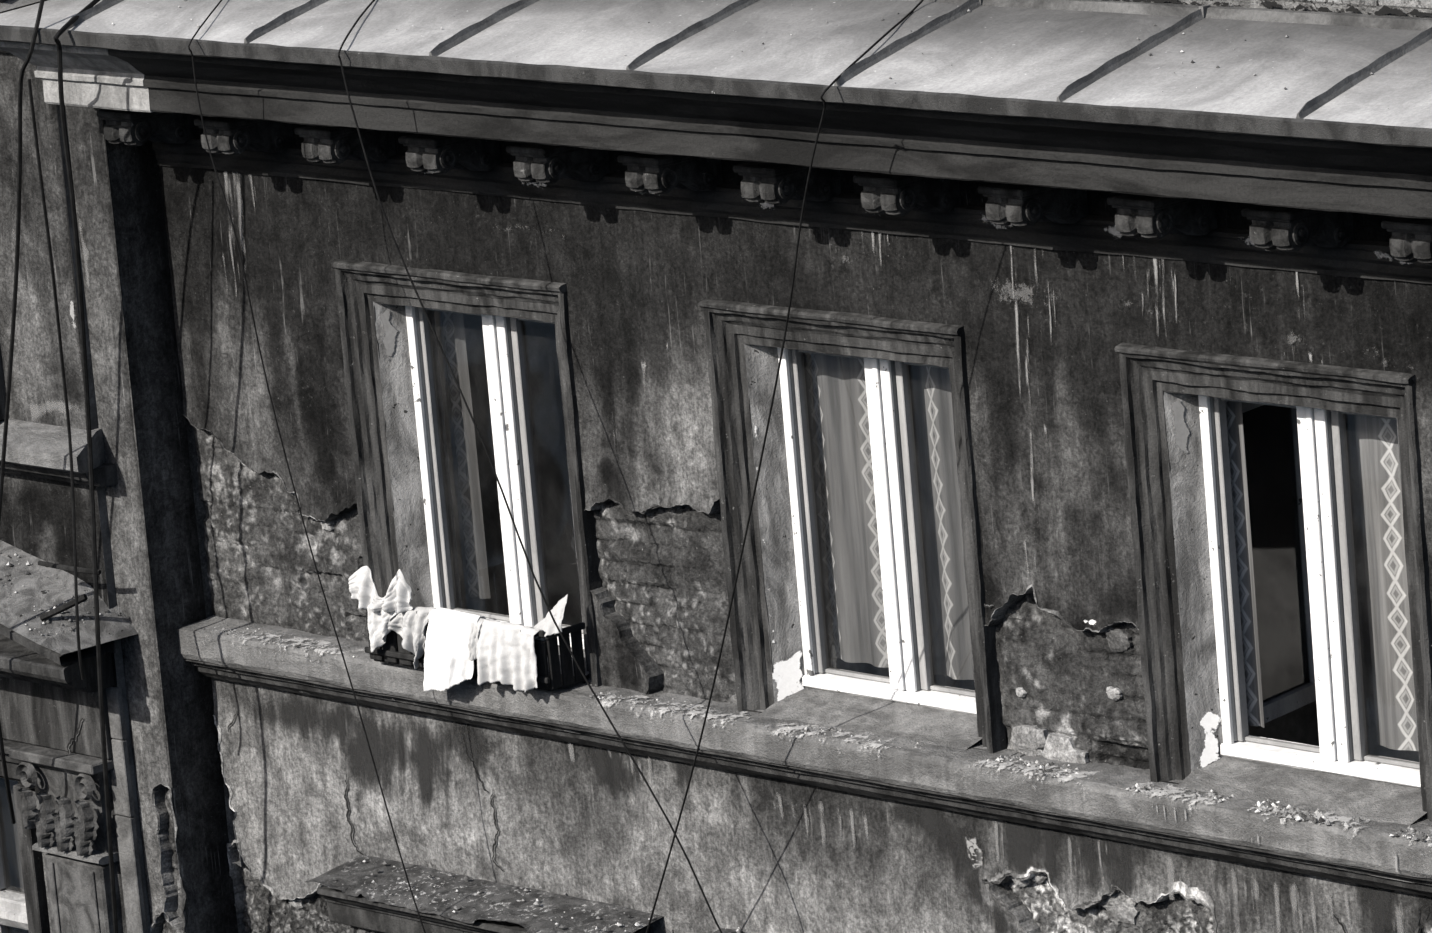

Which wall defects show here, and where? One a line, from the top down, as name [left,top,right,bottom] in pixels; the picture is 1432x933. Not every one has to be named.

leakage [224,171,254,268]
leakage [1010,246,1029,387]
spalling [183,414,369,642]
spalling [585,496,737,704]
spalling [984,584,1150,769]
spalling [150,783,195,933]
crack [344,774,365,855]
leakage [253,697,486,803]
spalling [965,837,1217,933]
spalling [1415,907,1432,933]